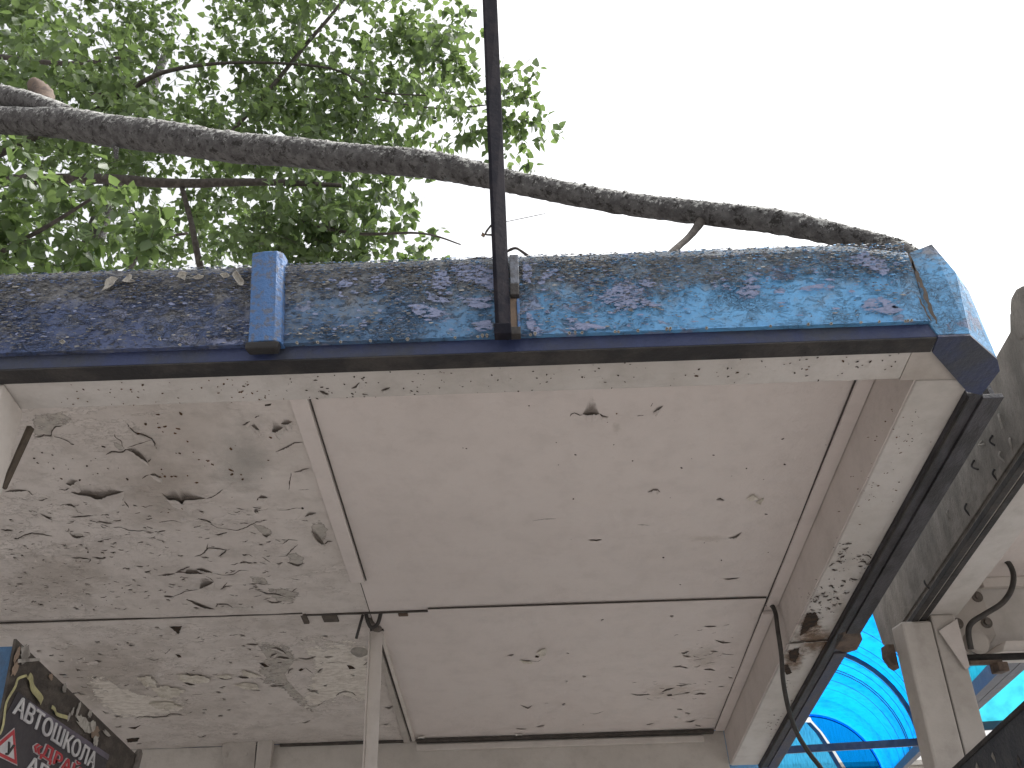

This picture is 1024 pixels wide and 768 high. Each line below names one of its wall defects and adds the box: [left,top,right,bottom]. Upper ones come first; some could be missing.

peeling [94,274,135,294]
peeling [220,271,244,292]
peeling [395,263,494,339]
peeling [522,260,561,290]
peeling [564,278,680,335]
peeling [846,250,902,283]
peeling [242,416,292,440]
peeling [106,435,162,483]
peeling [303,513,332,547]
peeling [161,567,299,605]
peeling [807,543,872,618]
peeling [85,637,370,745]